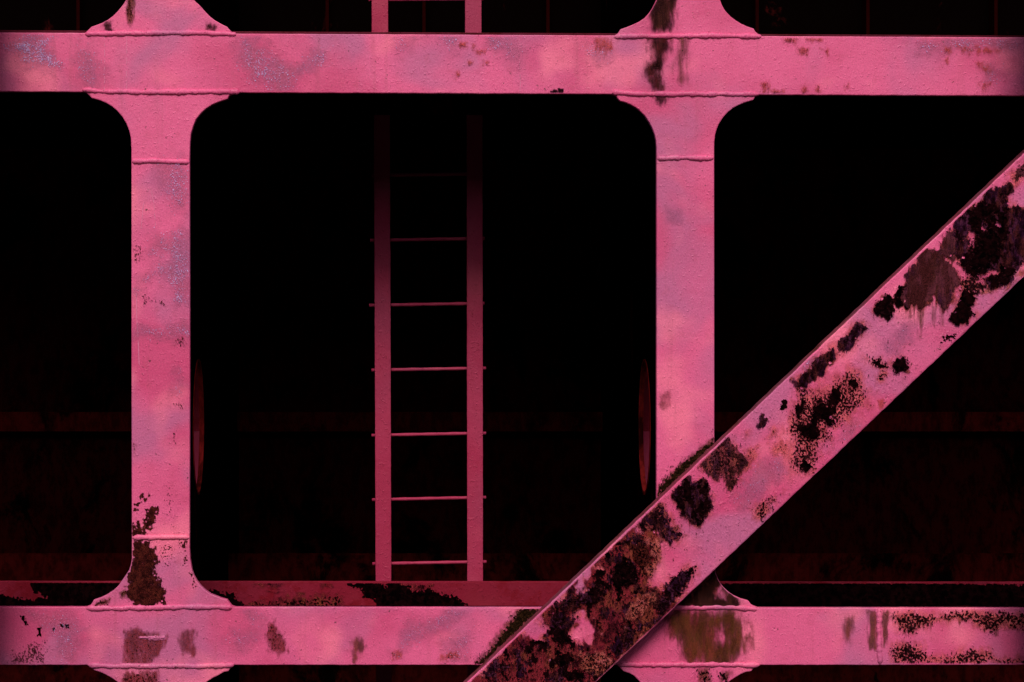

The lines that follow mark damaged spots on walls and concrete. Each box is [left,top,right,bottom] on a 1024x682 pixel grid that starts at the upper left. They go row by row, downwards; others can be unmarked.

corrosion [471,163,1024,682]
corrosion [95,487,196,606]
water stain [664,610,747,663]